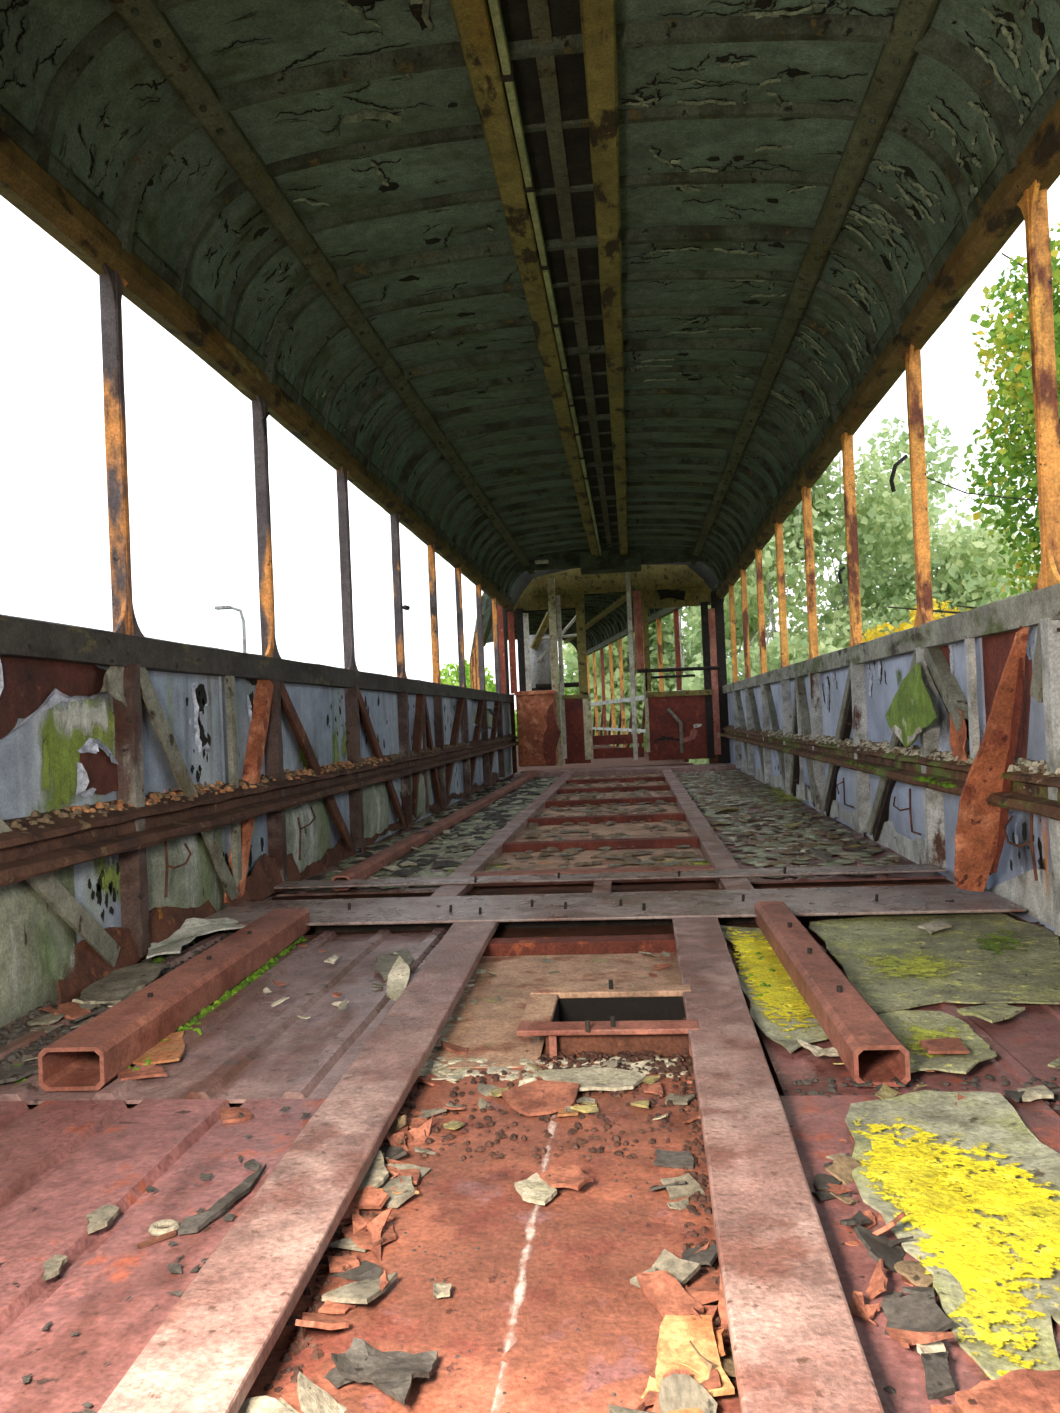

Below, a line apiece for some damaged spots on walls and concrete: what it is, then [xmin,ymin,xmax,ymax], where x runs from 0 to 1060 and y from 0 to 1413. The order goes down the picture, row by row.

rust [982,626,1035,759]
spalling [76,737,120,798]
rust [295,1114,436,1330]